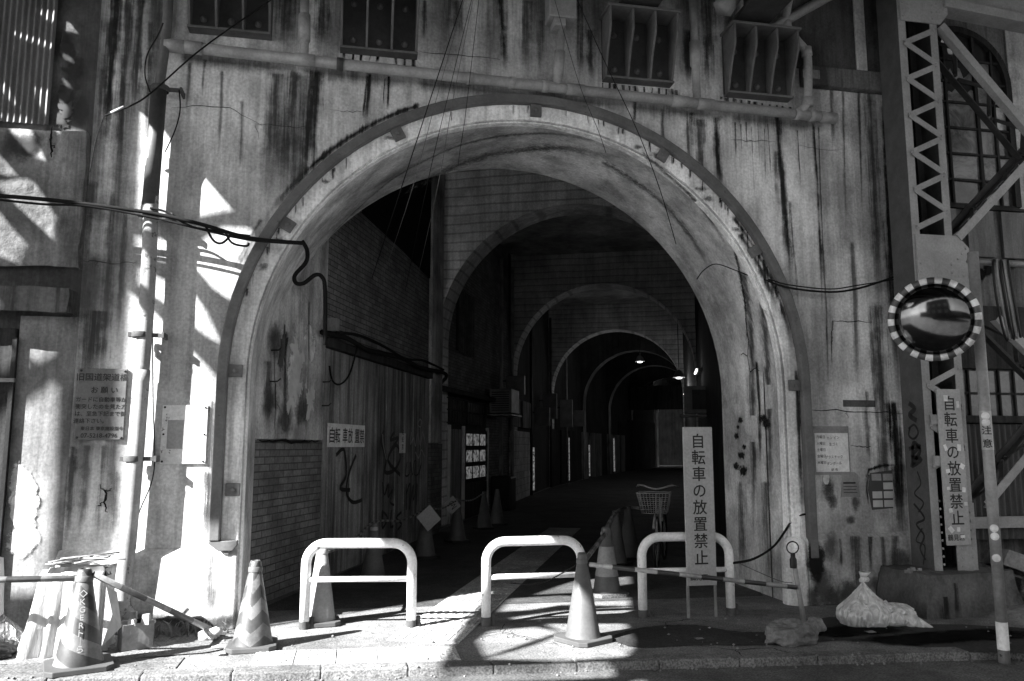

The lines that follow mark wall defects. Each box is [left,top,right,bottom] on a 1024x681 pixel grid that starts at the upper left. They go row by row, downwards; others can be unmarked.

water stain [318,0,330,38]
water stain [498,0,506,58]
water stain [577,0,593,70]
water stain [268,71,418,199]
water stain [797,126,833,360]
water stain [858,93,894,305]
water stain [851,243,905,515]
peeling [6,463,40,558]
crack [98,488,112,512]
water stain [807,536,898,606]